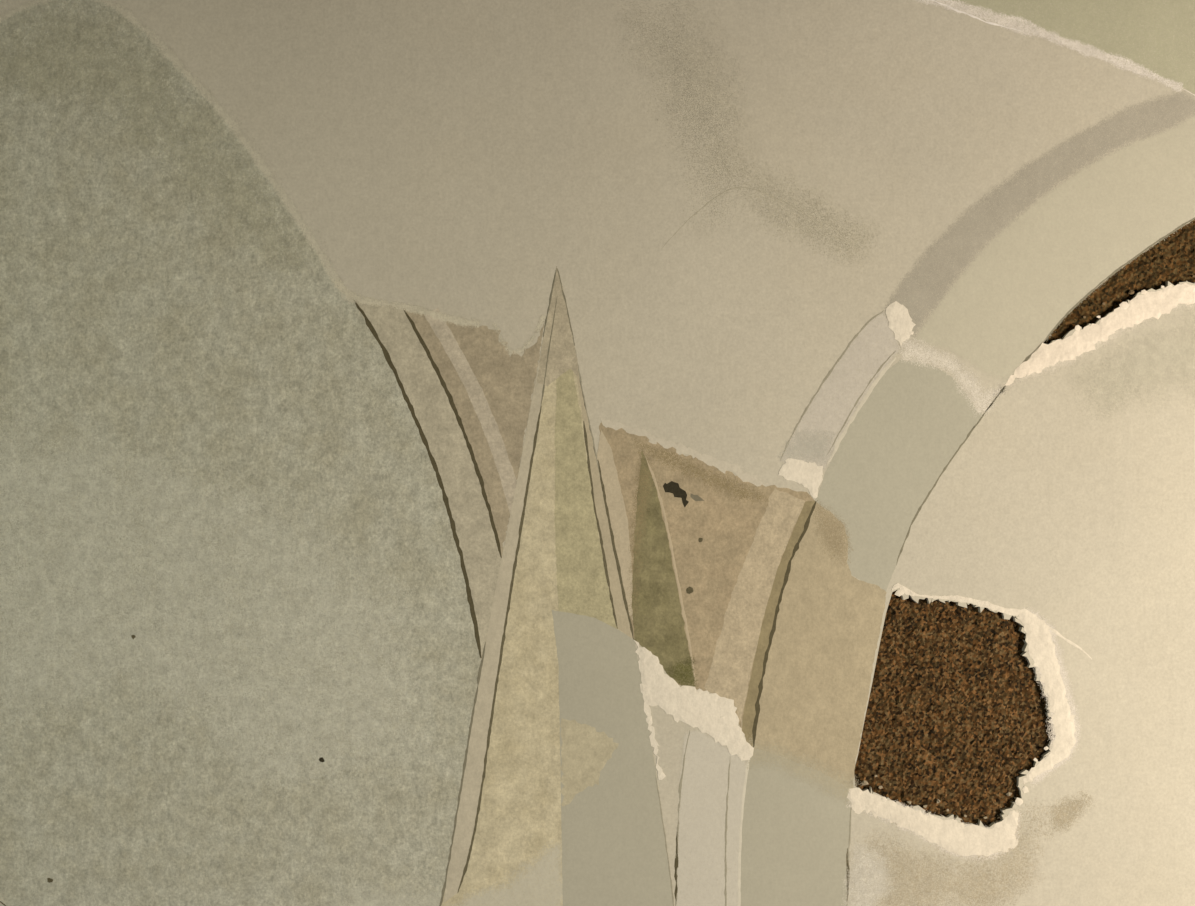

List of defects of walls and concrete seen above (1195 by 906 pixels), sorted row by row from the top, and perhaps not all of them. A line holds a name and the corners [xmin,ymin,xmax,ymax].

spalling [1000,217,1195,395]
spalling [663,481,704,507]
spalling [847,583,1092,866]